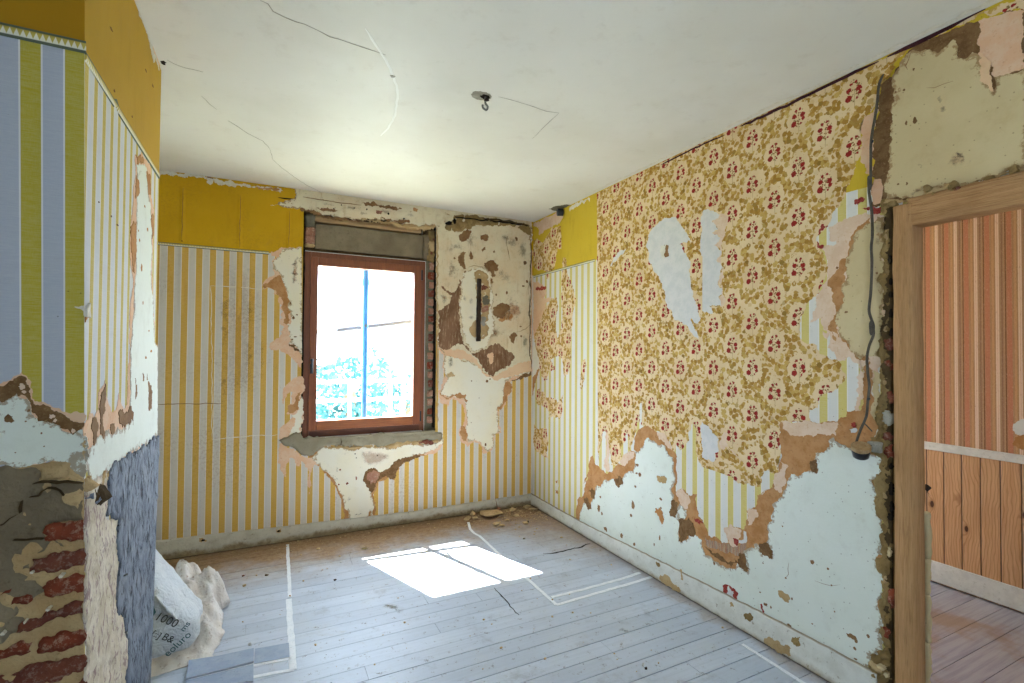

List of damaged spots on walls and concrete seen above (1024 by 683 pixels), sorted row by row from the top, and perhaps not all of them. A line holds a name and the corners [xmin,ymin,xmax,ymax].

crack [211,105,318,199]
flaking render [0,163,590,683]
flaking render [579,40,1024,683]